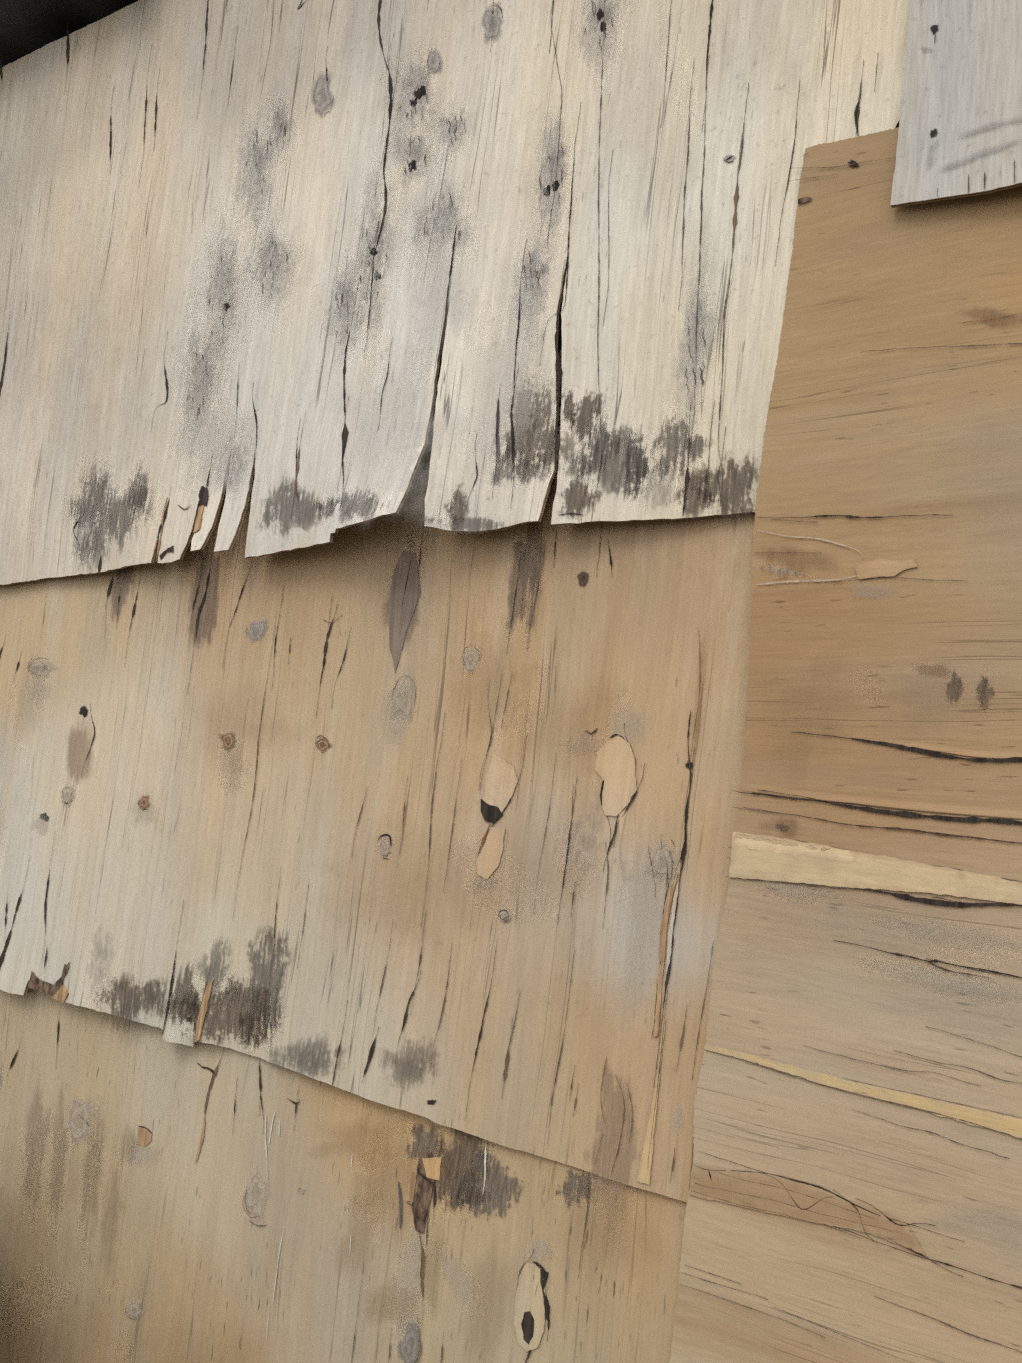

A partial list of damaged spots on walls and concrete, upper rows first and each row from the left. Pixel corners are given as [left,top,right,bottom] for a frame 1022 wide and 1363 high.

crack [337,0,440,509]
crack [466,0,613,577]
water stain [76,472,147,555]
crack [234,368,257,469]
crack [291,412,306,520]
water stain [495,389,754,521]
crack [187,534,291,914]
crack [316,599,351,747]
crack [332,530,557,1085]
water stain [101,929,287,1047]
crack [465,757,618,1137]
crack [195,1047,300,1164]